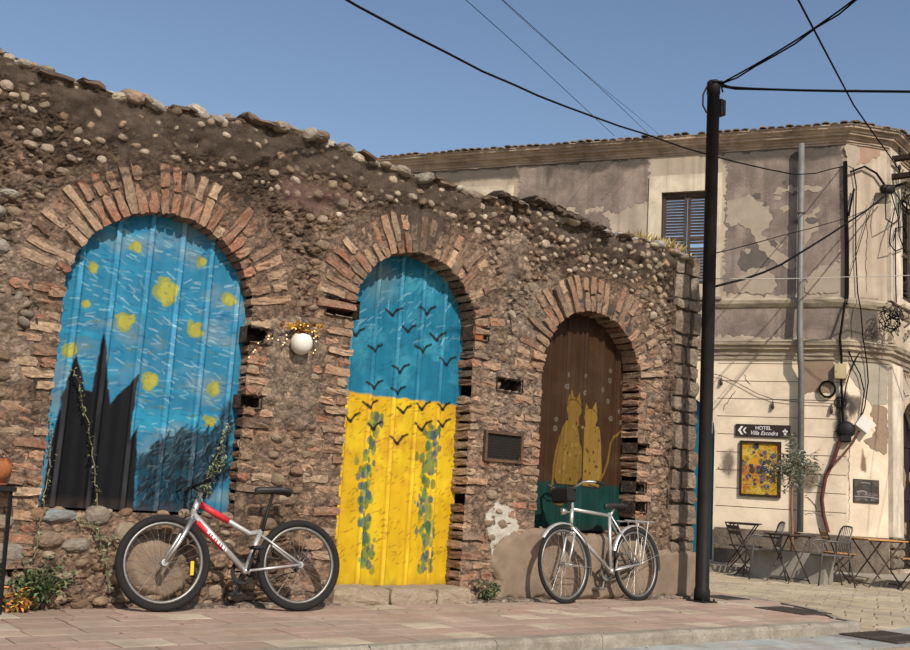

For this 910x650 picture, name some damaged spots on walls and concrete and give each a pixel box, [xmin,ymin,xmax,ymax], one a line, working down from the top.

flaking render [516,161,651,231]
flaking render [715,142,881,340]